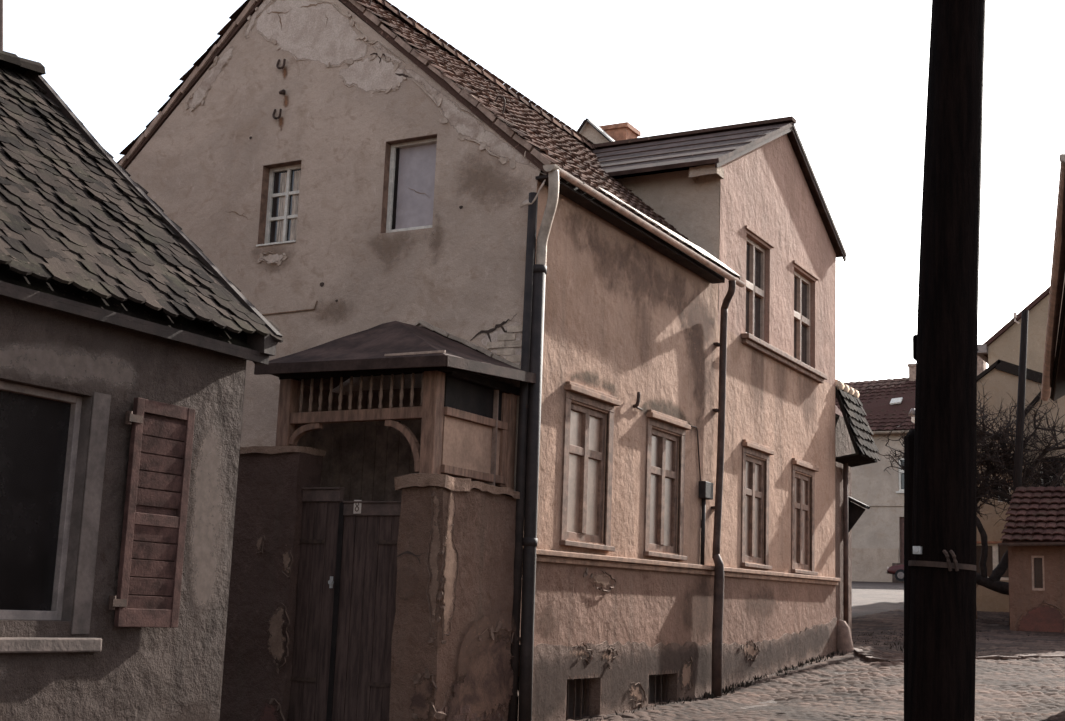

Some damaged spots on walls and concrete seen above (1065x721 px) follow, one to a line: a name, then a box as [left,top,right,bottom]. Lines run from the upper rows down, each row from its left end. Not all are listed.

flaking render [184,47,234,112]
flaking render [244,0,548,175]
flaking render [257,252,288,266]
crack [470,318,514,342]
leakage [587,229,714,425]
leakage [573,372,615,393]
spalling [426,486,458,644]
flaking render [268,602,290,674]
leakage [534,627,829,718]